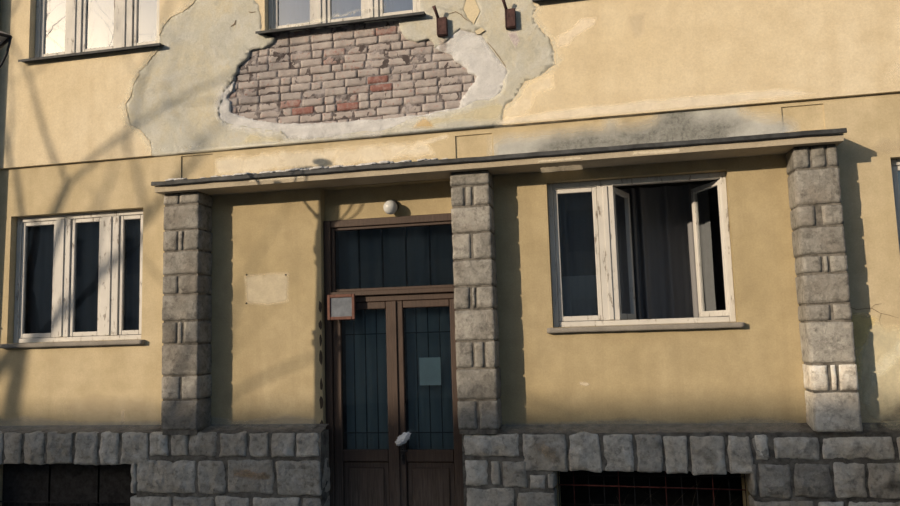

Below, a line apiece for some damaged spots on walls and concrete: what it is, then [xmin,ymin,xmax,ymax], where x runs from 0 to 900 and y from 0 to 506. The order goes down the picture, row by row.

flaking render [122,0,594,181]
damp [478,91,796,160]